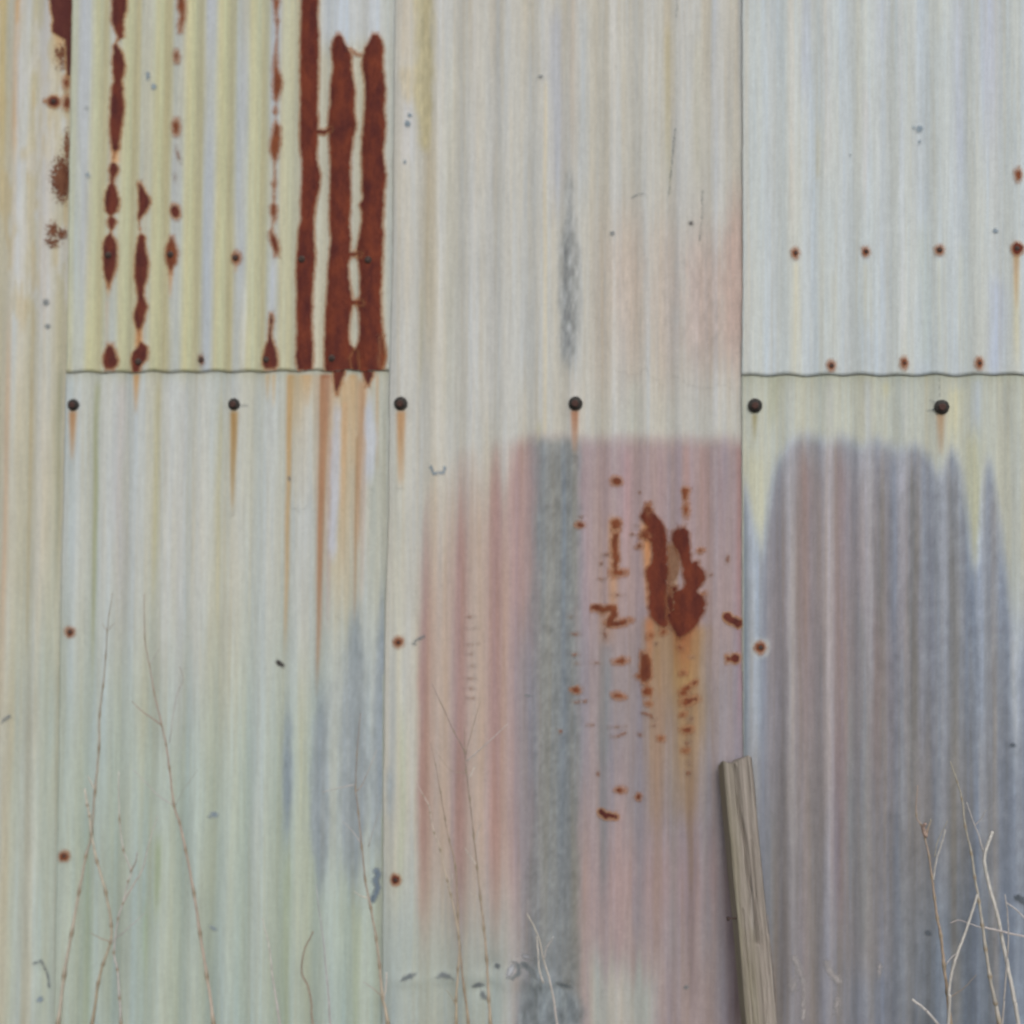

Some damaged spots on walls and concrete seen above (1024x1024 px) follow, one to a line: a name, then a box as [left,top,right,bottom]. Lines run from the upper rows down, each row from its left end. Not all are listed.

corrosion [177,0,186,33]
corrosion [43,0,72,110]
corrosion [172,118,180,136]
corrosion [48,127,70,204]
corrosion [44,219,67,249]
corrosion [102,0,151,416]
corrosion [164,235,178,300]
corrosion [170,204,181,219]
corrosion [1010,242,1024,314]
corrosion [262,0,387,696]
corrosion [590,487,743,984]